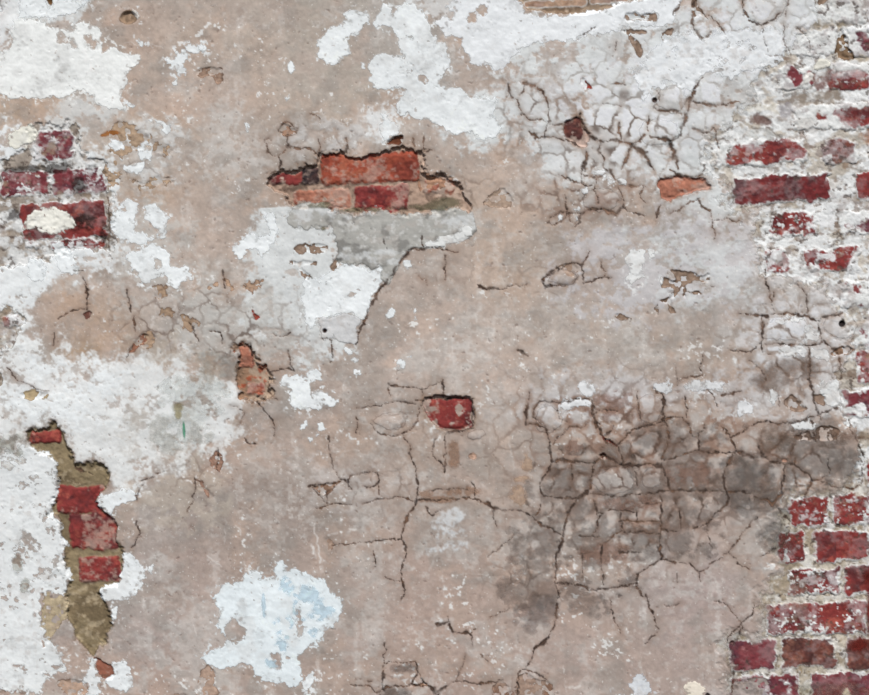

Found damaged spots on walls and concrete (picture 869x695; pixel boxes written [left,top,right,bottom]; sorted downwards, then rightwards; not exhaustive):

peeling [0,0,143,110]
peeling [166,43,207,85]
crack [673,0,724,39]
crack [742,1,810,56]
flaking render [0,119,201,332]
crack [508,77,739,239]
flaking render [0,305,26,358]
flaking render [232,0,869,695]
leakage [756,358,814,391]
peeling [0,421,154,695]
crack [308,380,506,597]
crack [350,269,864,695]